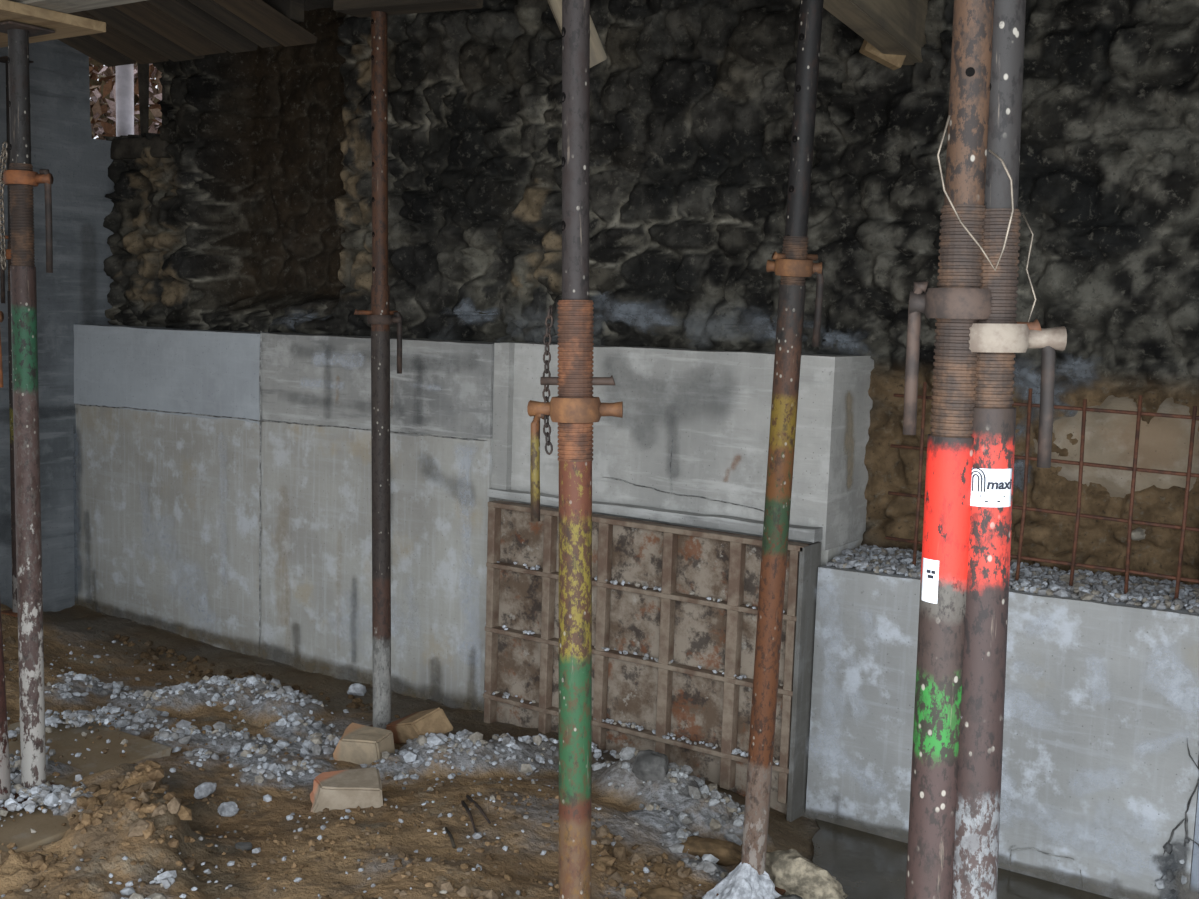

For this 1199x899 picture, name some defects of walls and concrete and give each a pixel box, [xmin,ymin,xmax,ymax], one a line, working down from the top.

spalling [885,382,933,567]
spalling [1010,388,1199,600]
crack [1154,738,1199,887]